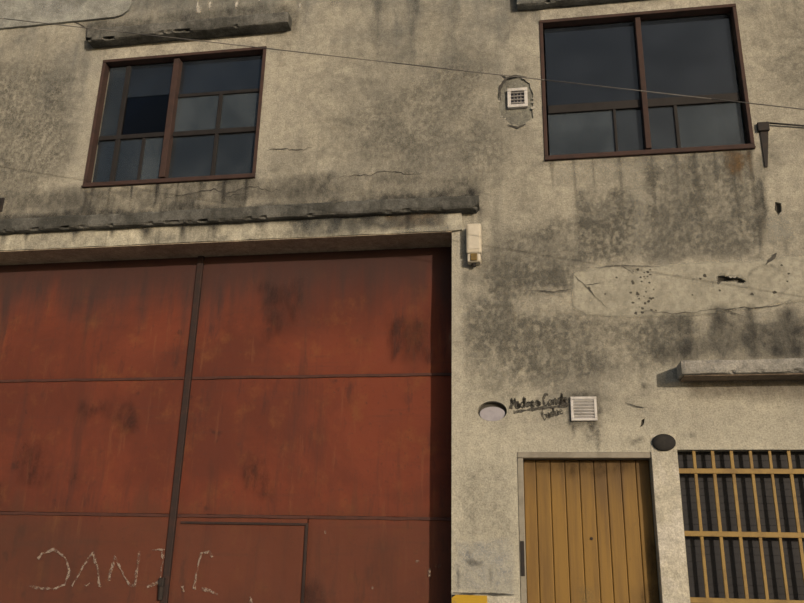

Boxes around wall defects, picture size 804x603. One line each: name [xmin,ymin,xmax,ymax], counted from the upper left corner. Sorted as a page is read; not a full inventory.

spalling [497,74,536,126]
water stain [647,151,762,253]
crack [527,265,659,307]
spalling [573,253,804,317]
crack [641,302,797,315]